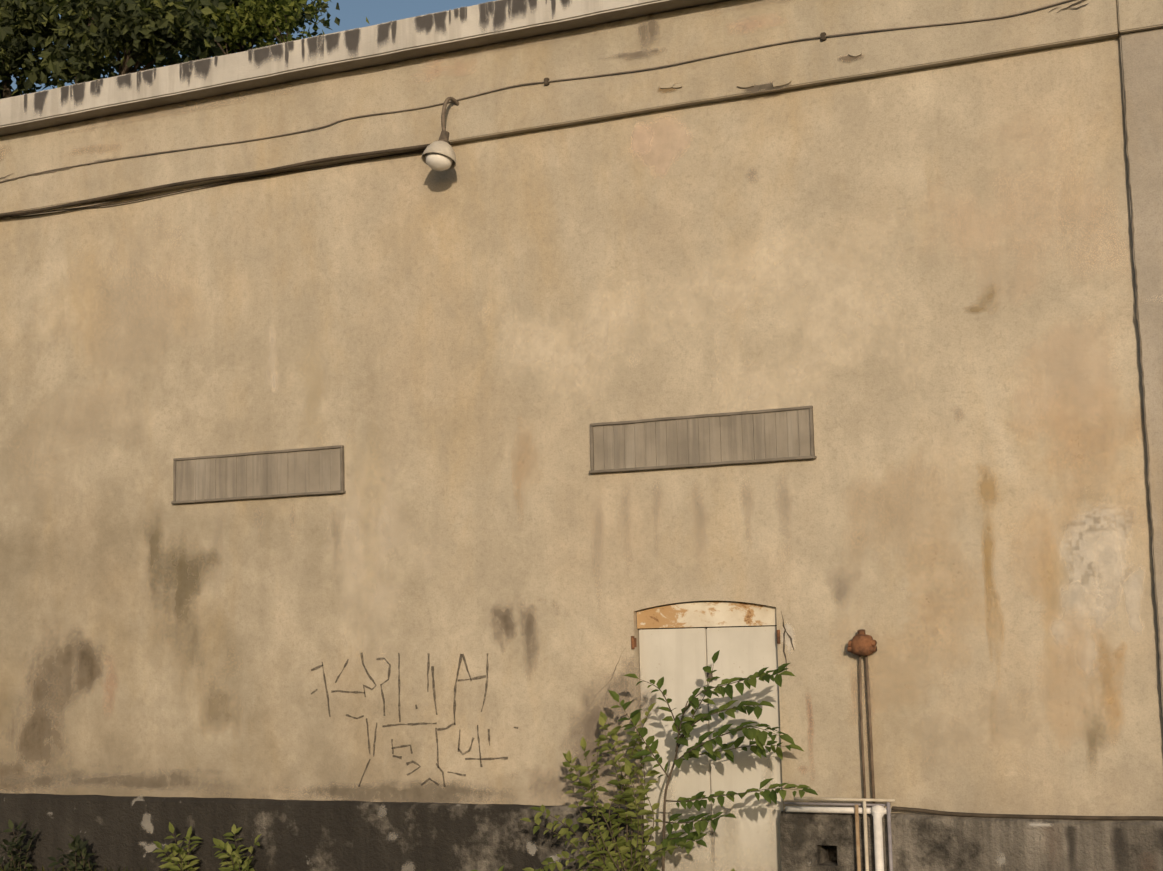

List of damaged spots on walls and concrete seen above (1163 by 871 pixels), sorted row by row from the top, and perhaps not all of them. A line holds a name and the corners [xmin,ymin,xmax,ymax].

damp [24,68,156,114]
damp [179,56,218,84]
damp [148,523,217,659]
corrosion [984,527,996,621]
damp [492,608,537,667]
damp [0,632,217,792]
damp [309,782,491,803]
damp [1067,827,1075,860]
damp [1114,828,1125,871]